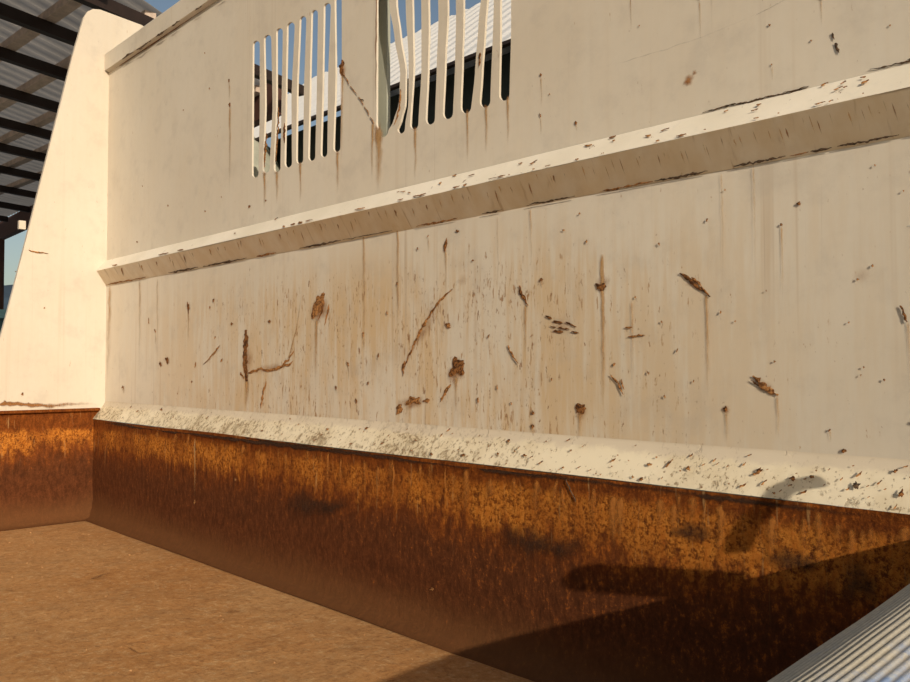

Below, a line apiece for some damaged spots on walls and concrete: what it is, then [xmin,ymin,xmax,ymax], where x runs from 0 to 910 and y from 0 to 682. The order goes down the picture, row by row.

rust [372,124,382,167]
rust [311,293,329,344]
rust [396,356,465,415]
rust [575,403,586,423]
rust [109,423,820,538]